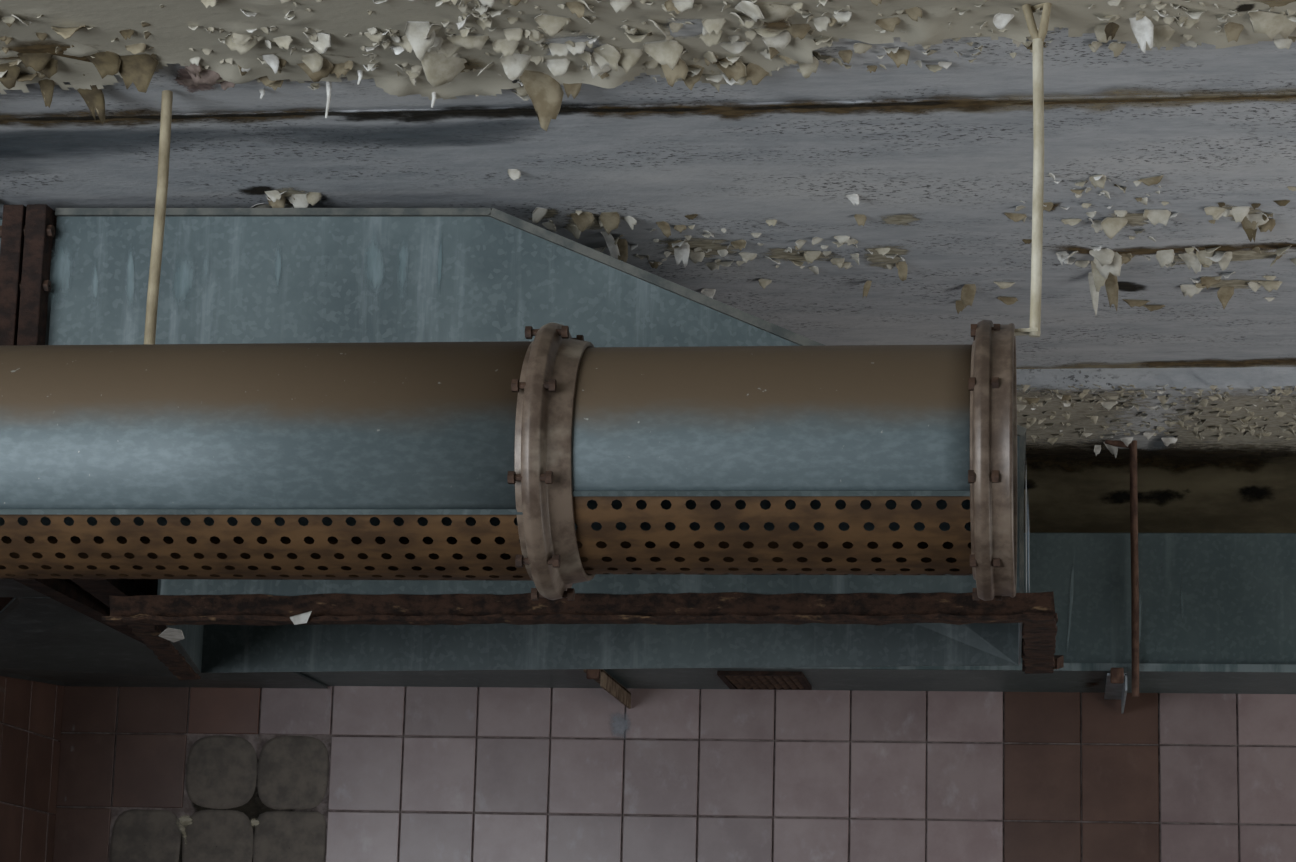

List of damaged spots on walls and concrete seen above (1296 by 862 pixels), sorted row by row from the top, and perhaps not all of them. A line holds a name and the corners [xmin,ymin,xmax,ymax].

peeling [0,15,158,124]
peeling [174,0,1062,131]
peeling [1088,0,1296,57]
peeling [508,169,521,180]
peeling [529,194,920,299]
peeling [1004,173,1296,316]
water stain [1102,490,1182,505]
water stain [1024,441,1296,501]